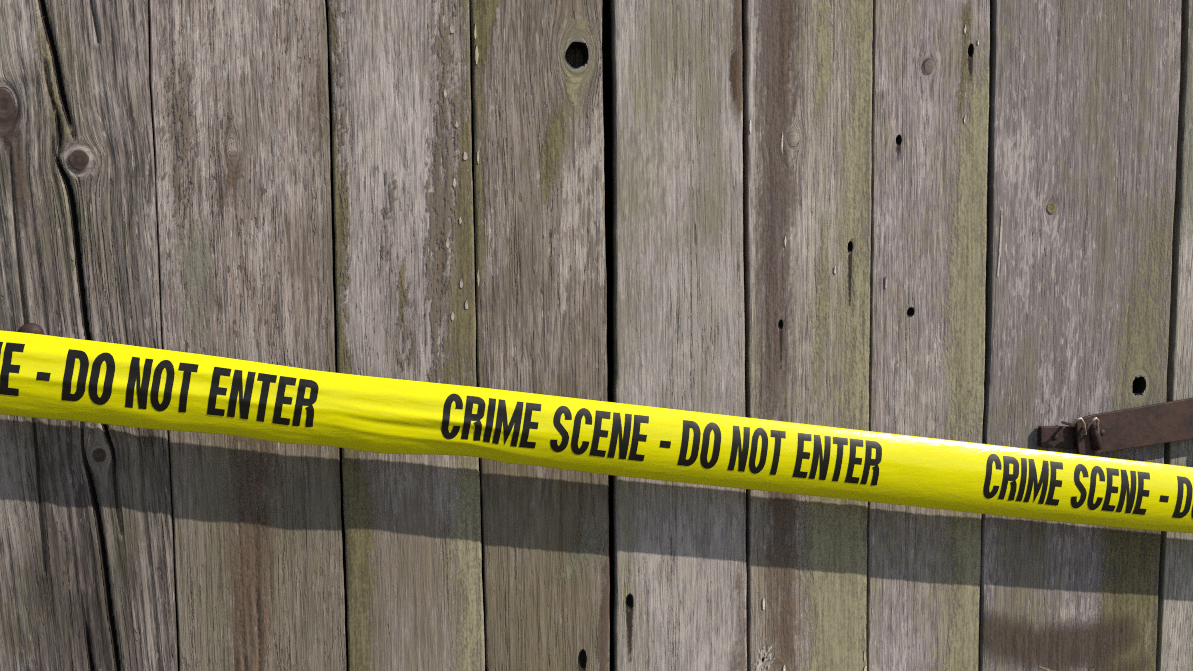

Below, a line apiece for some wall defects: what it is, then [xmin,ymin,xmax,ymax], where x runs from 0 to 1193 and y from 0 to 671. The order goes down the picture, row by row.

crack [90,0,99,43]
crack [9,150,26,324]
crack [39,0,91,341]
crack [32,418,46,572]
crack [80,421,122,671]